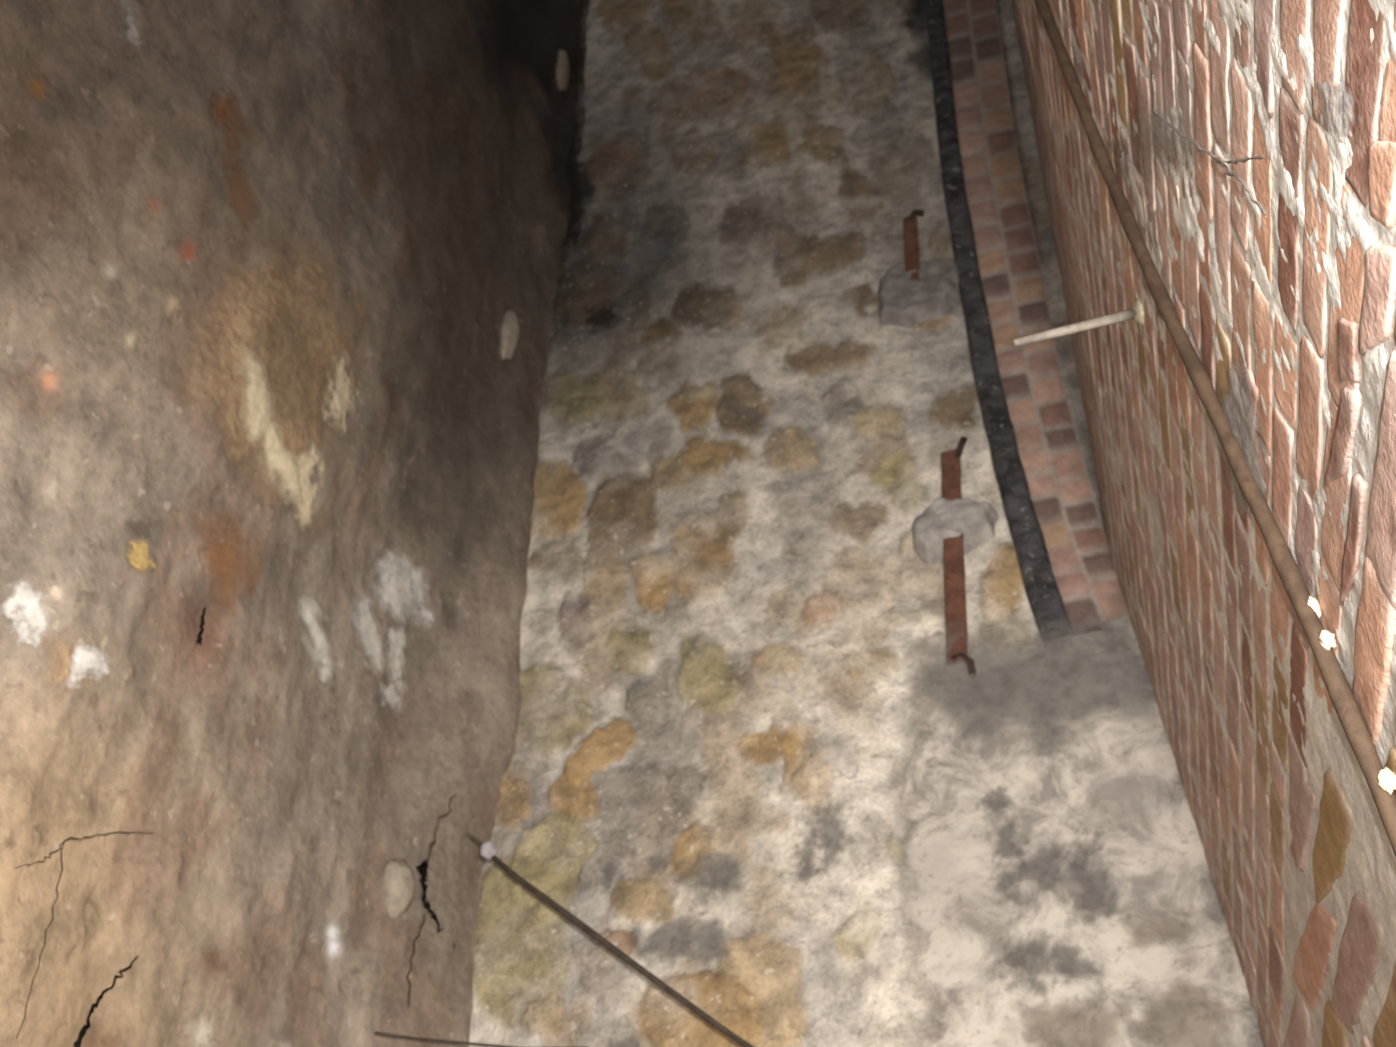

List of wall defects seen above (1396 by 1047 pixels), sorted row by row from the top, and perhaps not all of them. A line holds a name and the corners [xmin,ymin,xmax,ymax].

efflorescence [5,582,47,637]
efflorescence [56,645,108,684]
crack [196,607,206,646]
efflorescence [302,600,342,681]
efflorescence [355,553,433,707]
crack [16,831,154,1047]
crack [407,794,457,1006]